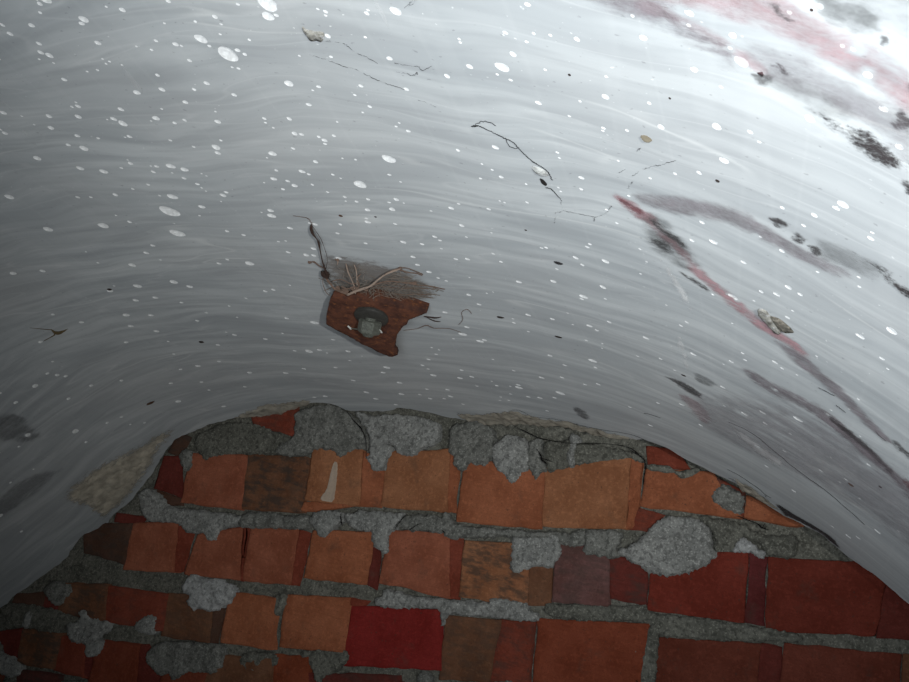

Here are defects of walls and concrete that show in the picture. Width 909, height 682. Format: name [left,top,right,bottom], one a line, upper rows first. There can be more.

crack [471,121,562,201]
water stain [617,196,685,254]
water stain [656,200,821,262]
flaking render [235,395,328,418]
water stain [669,378,701,397]
water stain [682,268,909,456]
water stain [746,371,909,493]
water stain [777,505,839,547]